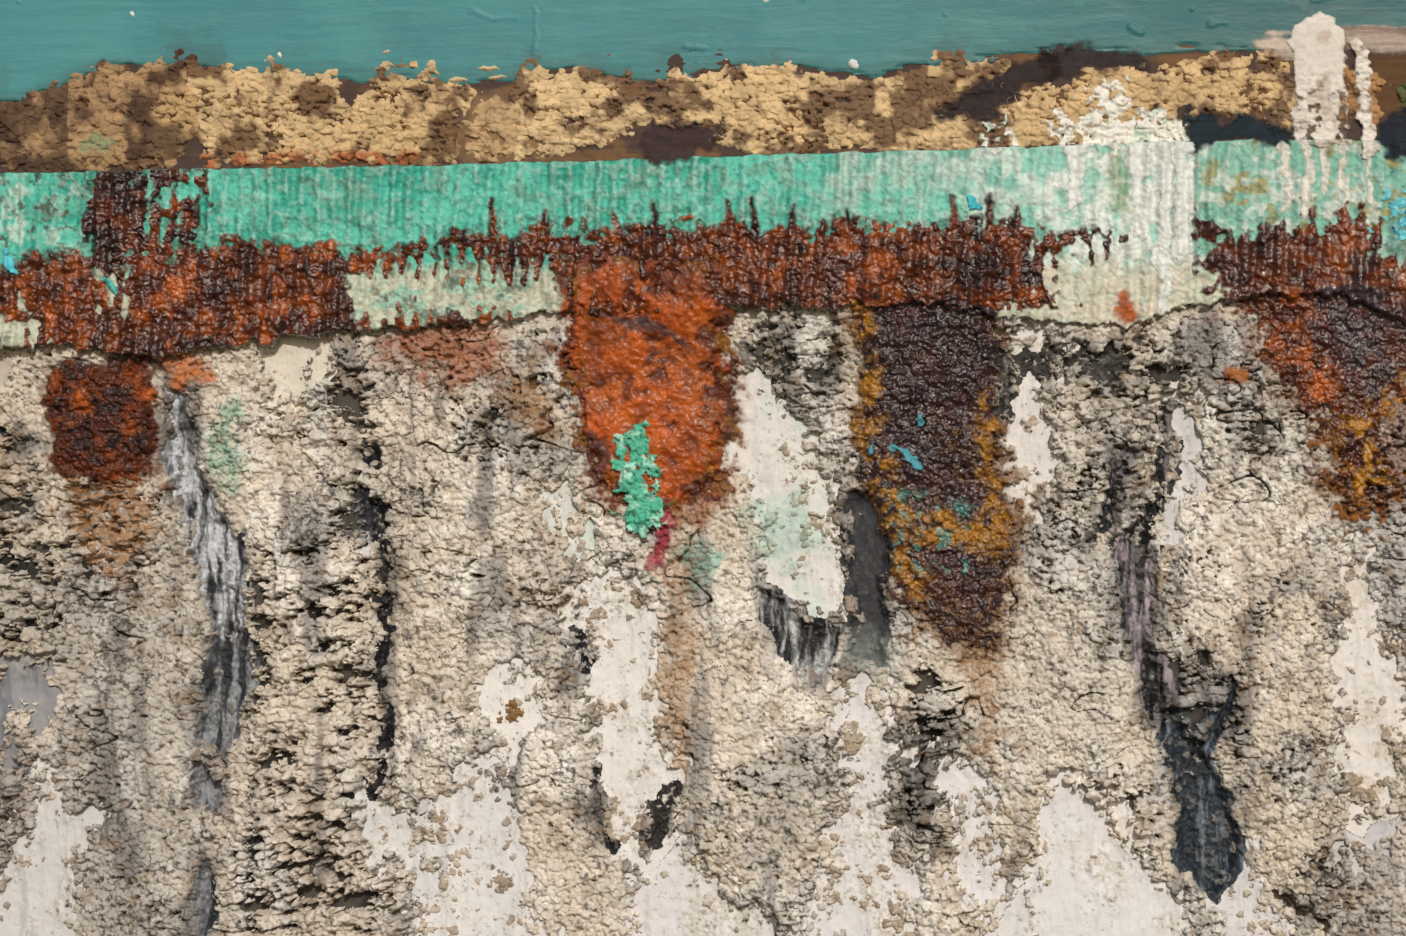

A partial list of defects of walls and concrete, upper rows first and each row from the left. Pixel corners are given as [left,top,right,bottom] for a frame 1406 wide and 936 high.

rust [0,168,1129,717]
spalling [723,362,857,624]
rust [1114,291,1137,322]
rust [1191,197,1406,548]
spalling [0,643,112,936]
spalling [349,442,1298,936]
spalling [1316,526,1406,883]